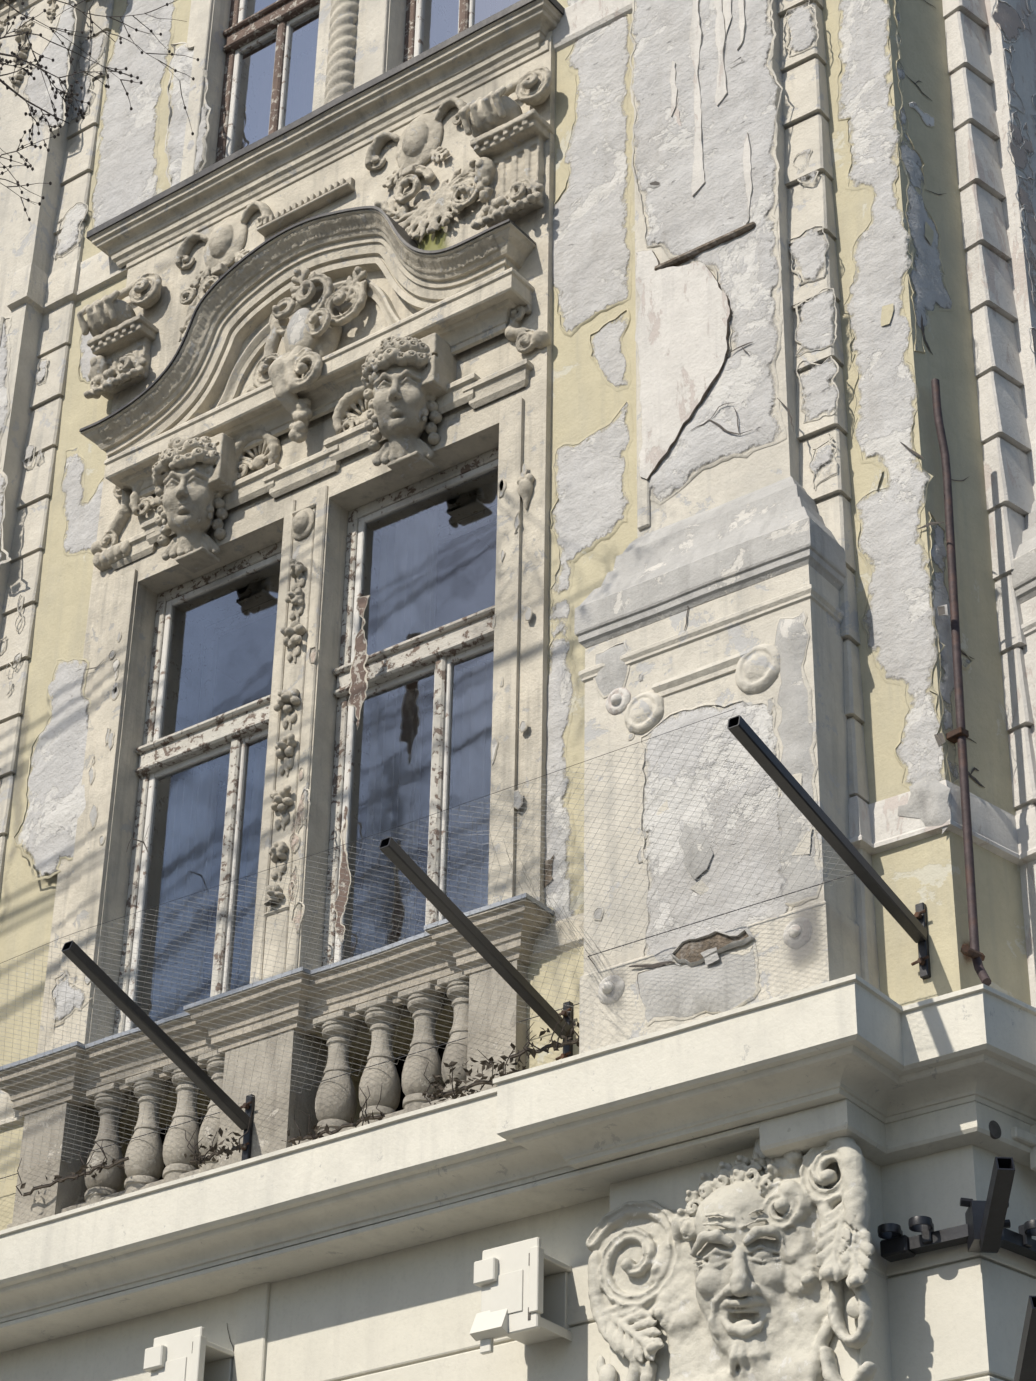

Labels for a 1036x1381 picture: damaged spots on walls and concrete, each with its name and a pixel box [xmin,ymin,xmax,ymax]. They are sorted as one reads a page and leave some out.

flaking render [22,0,211,259]
peeling [991,0,1036,306]
peeling [22,444,43,468]
peeling [36,358,48,384]
peeling [498,463,527,498]
crack [692,402,751,435]
flaking render [524,0,973,924]
peeling [1028,327,1036,356]
peeling [347,595,371,730]
flaking render [14,657,114,881]
peeling [334,805,351,943]
flaking render [628,610,823,1027]